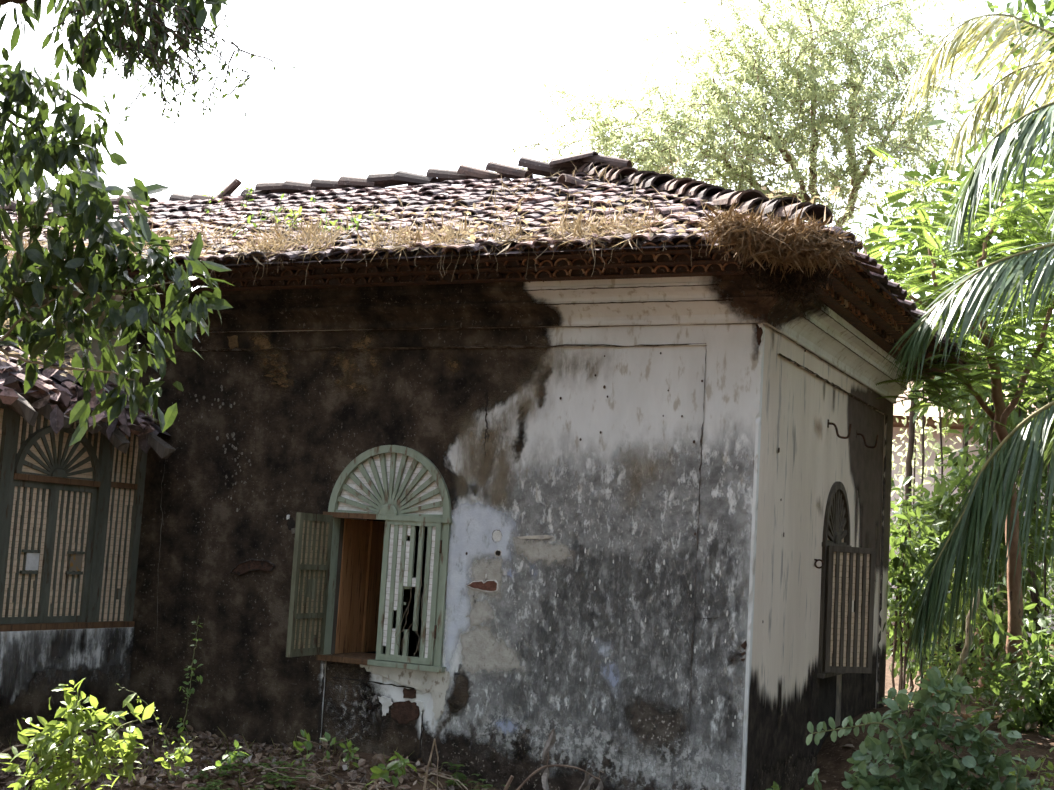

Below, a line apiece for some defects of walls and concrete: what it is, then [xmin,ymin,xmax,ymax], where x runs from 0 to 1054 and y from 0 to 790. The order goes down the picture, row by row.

leakage [0,282,820,790]
peeling [460,549,524,677]
peeling [513,537,571,575]
leakage [848,387,894,598]
flaking render [378,688,425,724]
leakage [840,646,886,725]